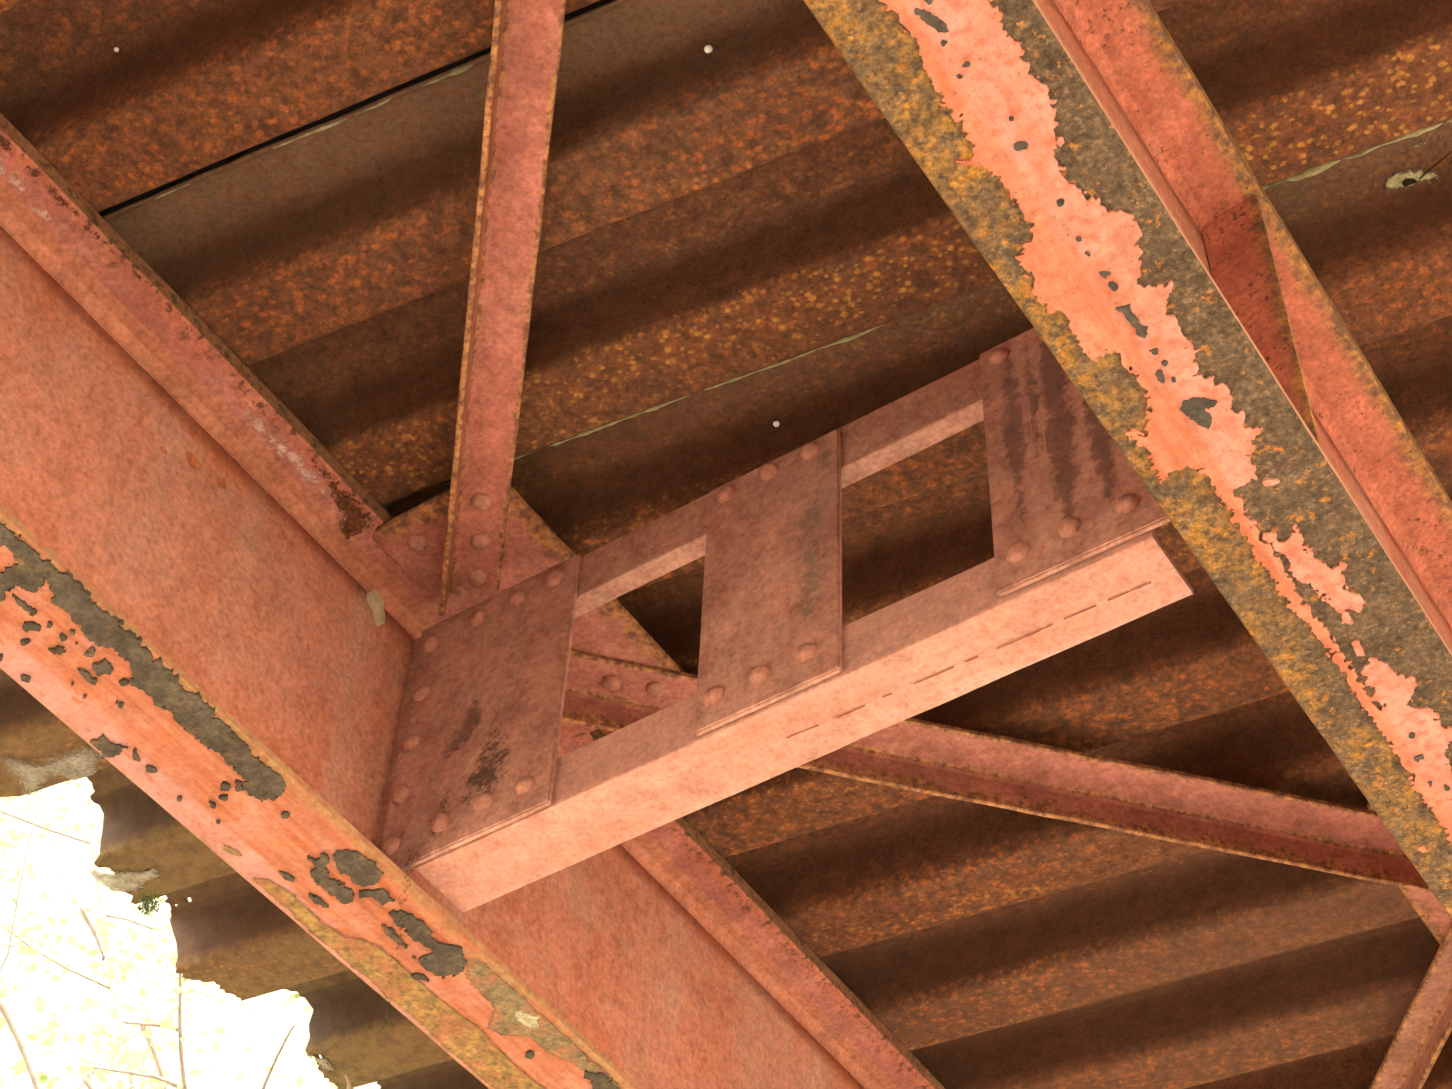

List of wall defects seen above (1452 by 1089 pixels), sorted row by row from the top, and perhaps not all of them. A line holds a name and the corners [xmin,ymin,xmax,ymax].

peeling [244,406,330,499]
peeling [879,0,1452,841]
peeling [0,522,290,825]
peeling [279,849,467,982]
peeling [583,1070,619,1089]